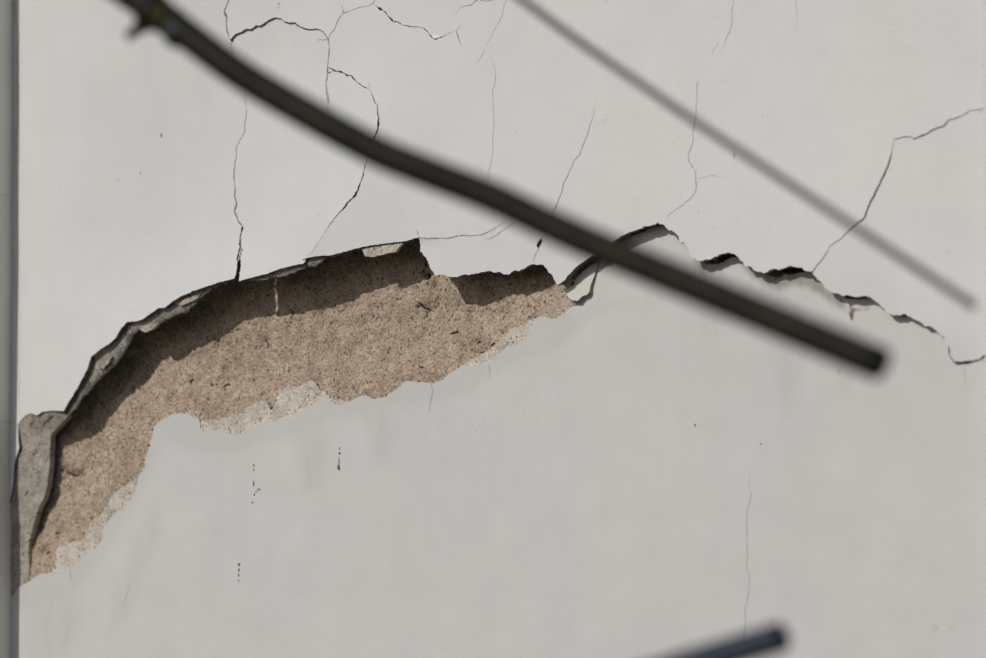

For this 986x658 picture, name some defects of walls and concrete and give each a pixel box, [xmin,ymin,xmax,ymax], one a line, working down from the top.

crack [233,98,247,230]
crack [224,0,506,177]
crack [417,227,500,239]
crack [555,107,600,208]
crack [623,82,713,239]
crack [705,253,737,264]
crack [770,109,983,279]
flaking render [10,239,594,596]